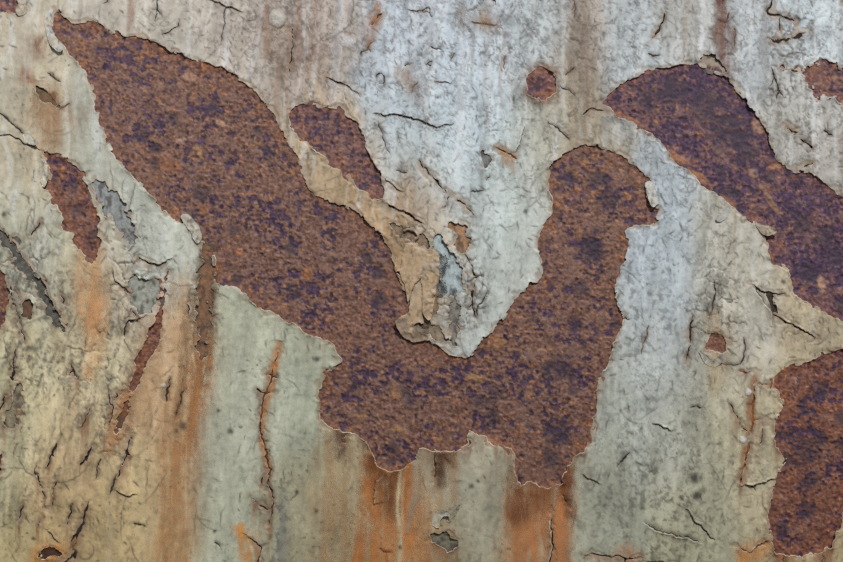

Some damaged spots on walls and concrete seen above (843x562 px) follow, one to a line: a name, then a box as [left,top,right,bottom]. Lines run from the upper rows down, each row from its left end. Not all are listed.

peeling [0,0,27,16]
peeling [23,133,138,264]
peeling [44,9,660,489]
peeling [602,53,843,322]
crack [0,221,71,410]
crack [19,443,89,562]
crack [79,437,137,497]
crack [244,352,279,562]
corrosion [353,455,394,562]
corrosion [404,463,425,562]
corrosion [507,466,572,562]
peeling [767,349,843,558]